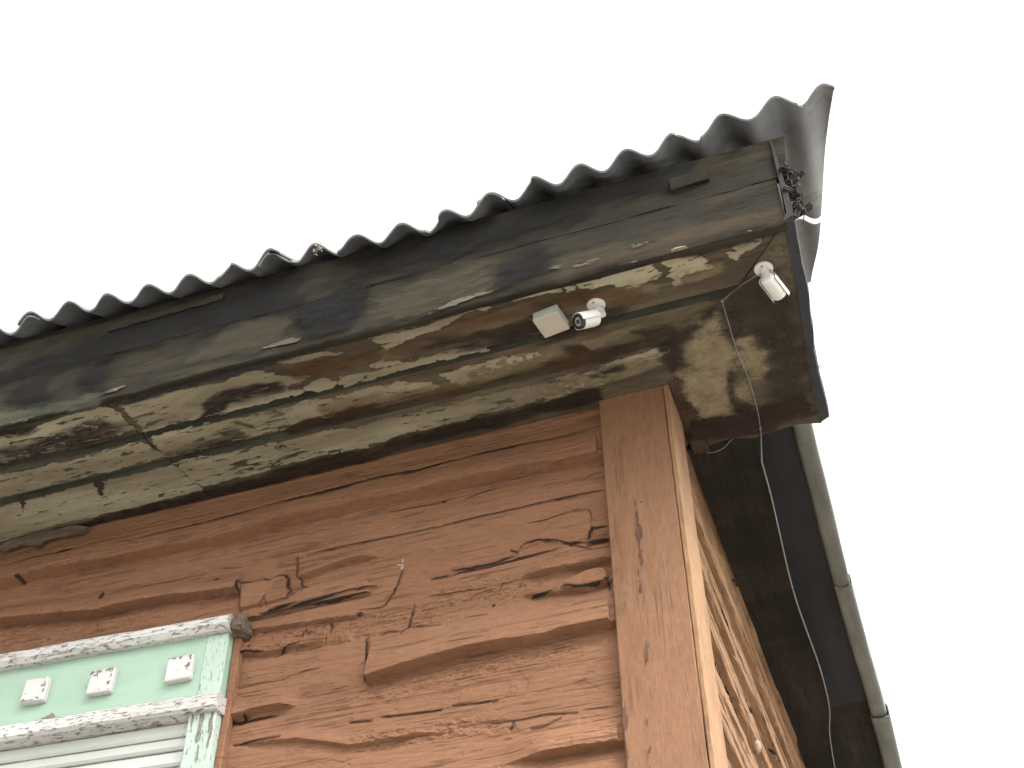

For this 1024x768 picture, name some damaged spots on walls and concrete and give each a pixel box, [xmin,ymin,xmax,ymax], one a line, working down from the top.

peeling [0,288,664,554]
leakage [0,160,696,451]
crack [133,428,590,537]
leakage [78,284,819,527]
peeling [513,230,763,301]
crack [119,472,615,746]
peeling [182,711,214,767]